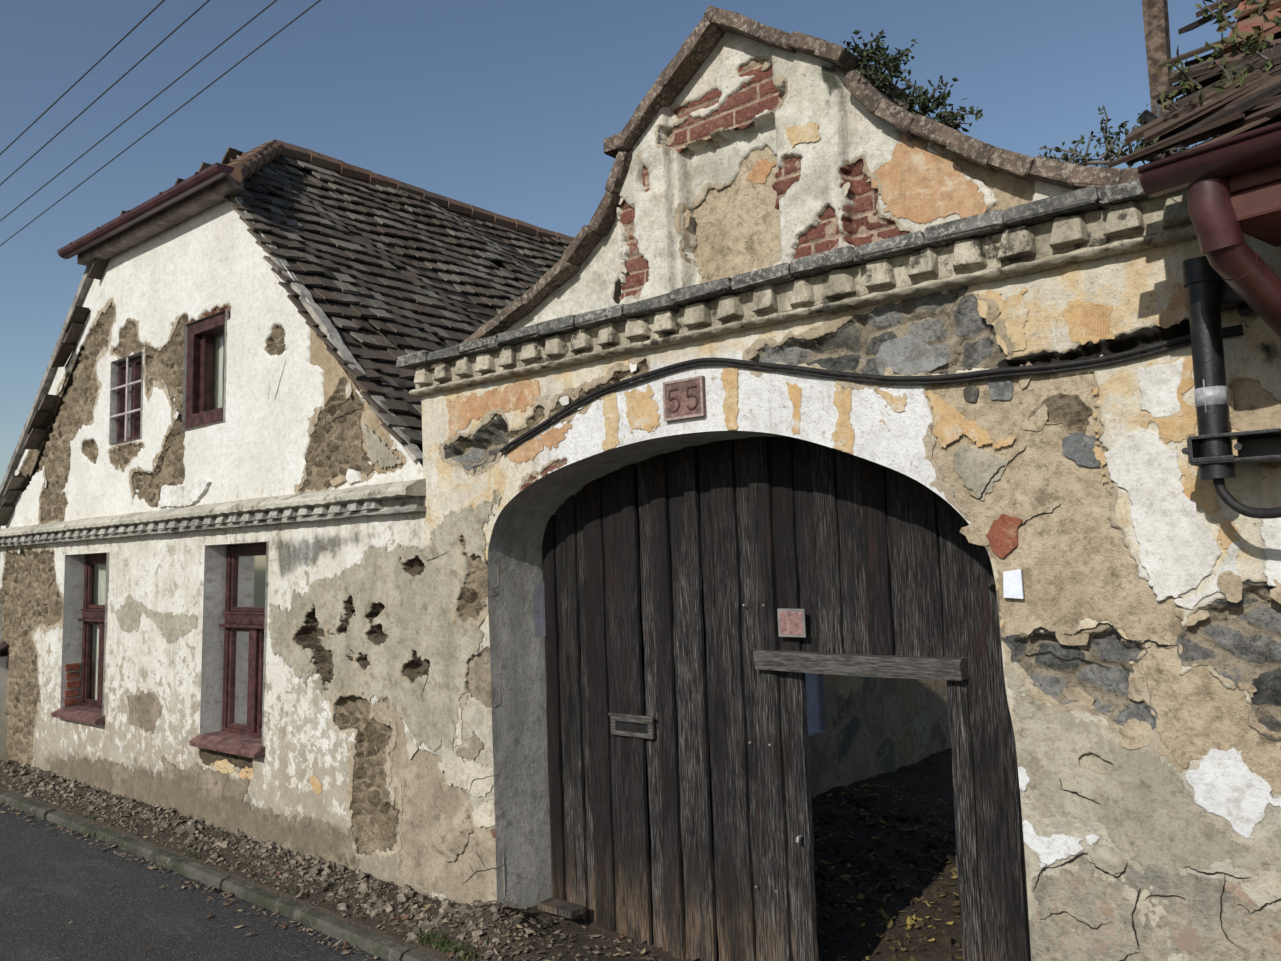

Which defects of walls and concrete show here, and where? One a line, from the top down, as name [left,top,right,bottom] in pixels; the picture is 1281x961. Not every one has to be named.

flaking render [613,197,650,304]
flaking render [641,166,650,192]
flaking render [654,56,788,157]
flaking render [673,121,1036,284]
flaking render [15,297,231,524]
flaking render [294,329,406,494]
flaking render [439,354,660,492]
flaking render [0,545,63,767]
peeling [50,489,501,905]
peeling [533,581,546,638]
flaking render [721,281,1281,961]
crack [1034,852,1281,961]